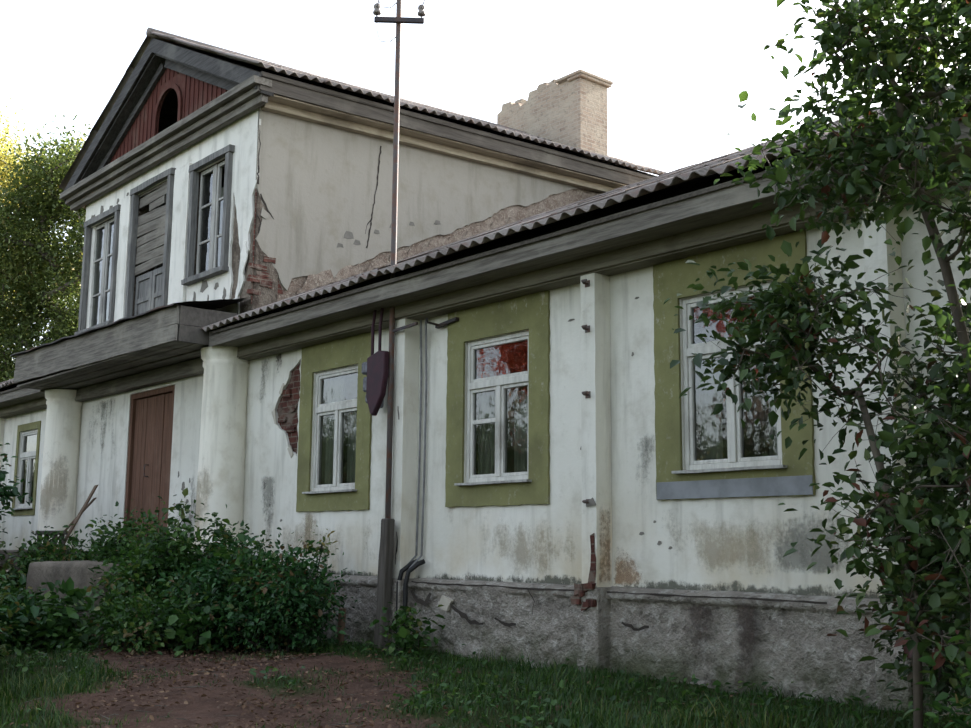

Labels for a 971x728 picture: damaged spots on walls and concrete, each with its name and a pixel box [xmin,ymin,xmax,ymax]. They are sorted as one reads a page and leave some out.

spalling [240,188,284,314]
crack [365,146,382,248]
flaking render [297,192,603,294]
flaking render [272,362,301,458]
damp [435,574,581,585]
damp [624,581,879,599]
damp [777,525,839,571]
damp [735,605,757,693]